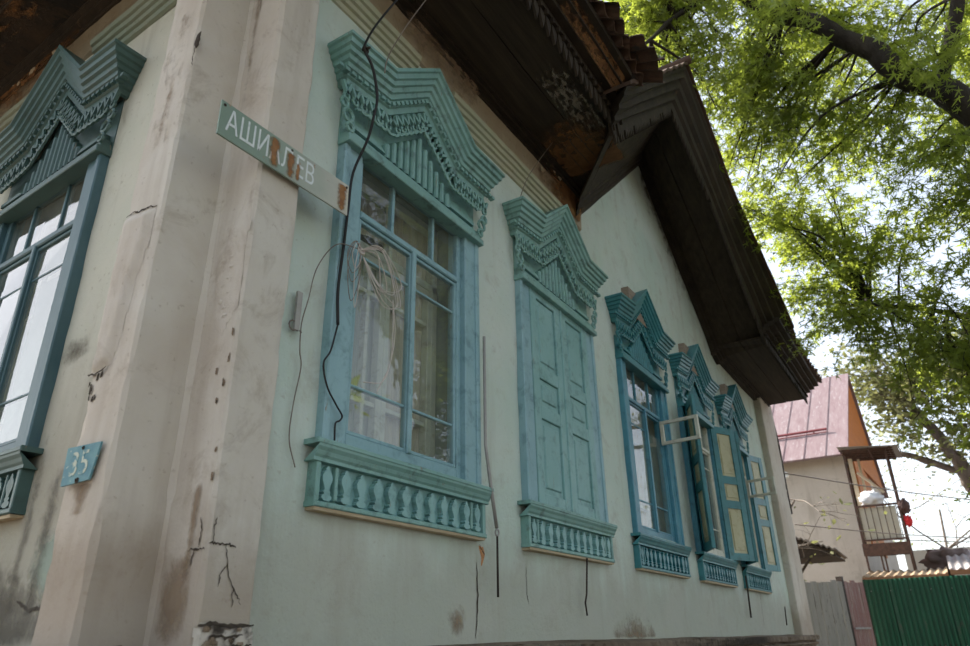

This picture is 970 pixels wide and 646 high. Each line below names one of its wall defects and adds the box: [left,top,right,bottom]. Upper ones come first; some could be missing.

peeling [537,72,604,129]
crack [189,517,240,607]
damp [0,565,40,644]
crack [17,584,40,613]
flaking render [192,621,254,646]